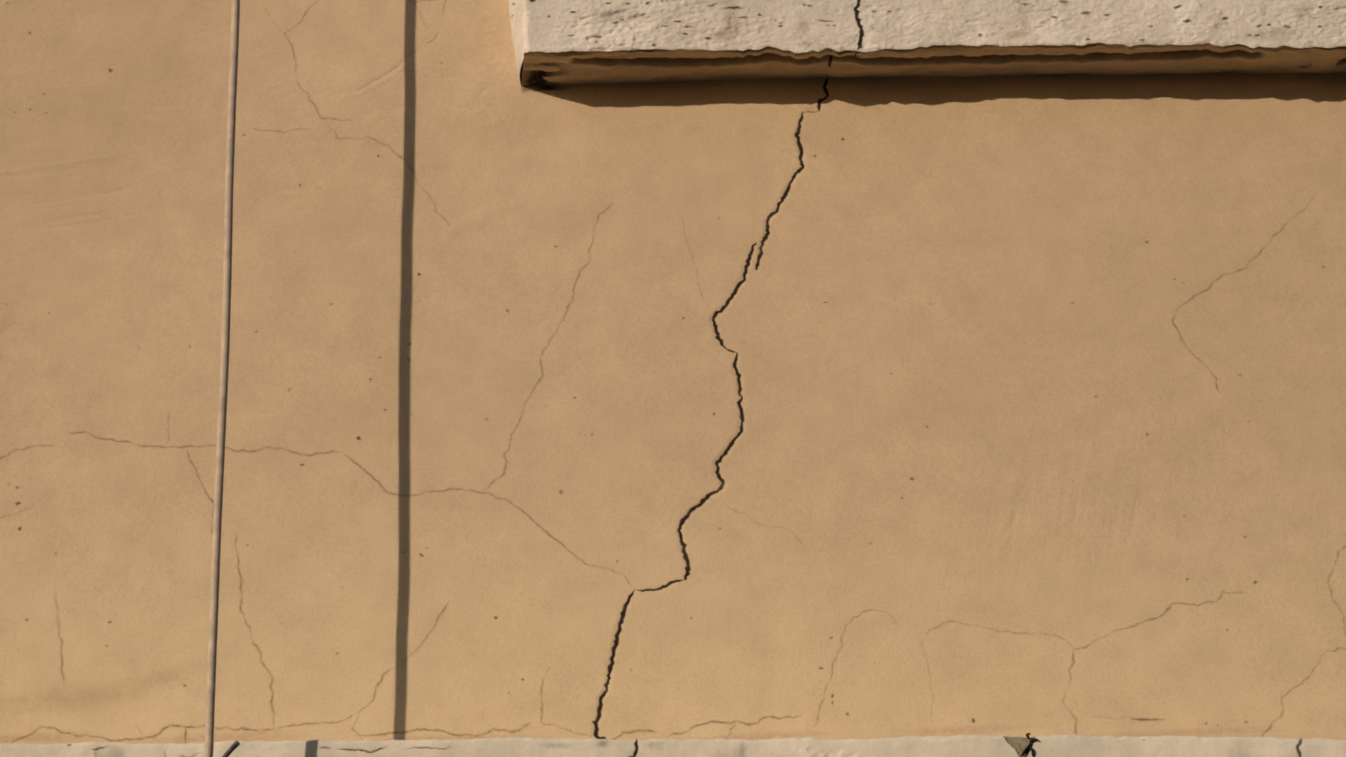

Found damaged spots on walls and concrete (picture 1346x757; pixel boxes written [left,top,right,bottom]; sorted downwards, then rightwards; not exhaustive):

crack [592,0,864,757]
crack [339,746,386,754]
crack [1295,738,1303,757]